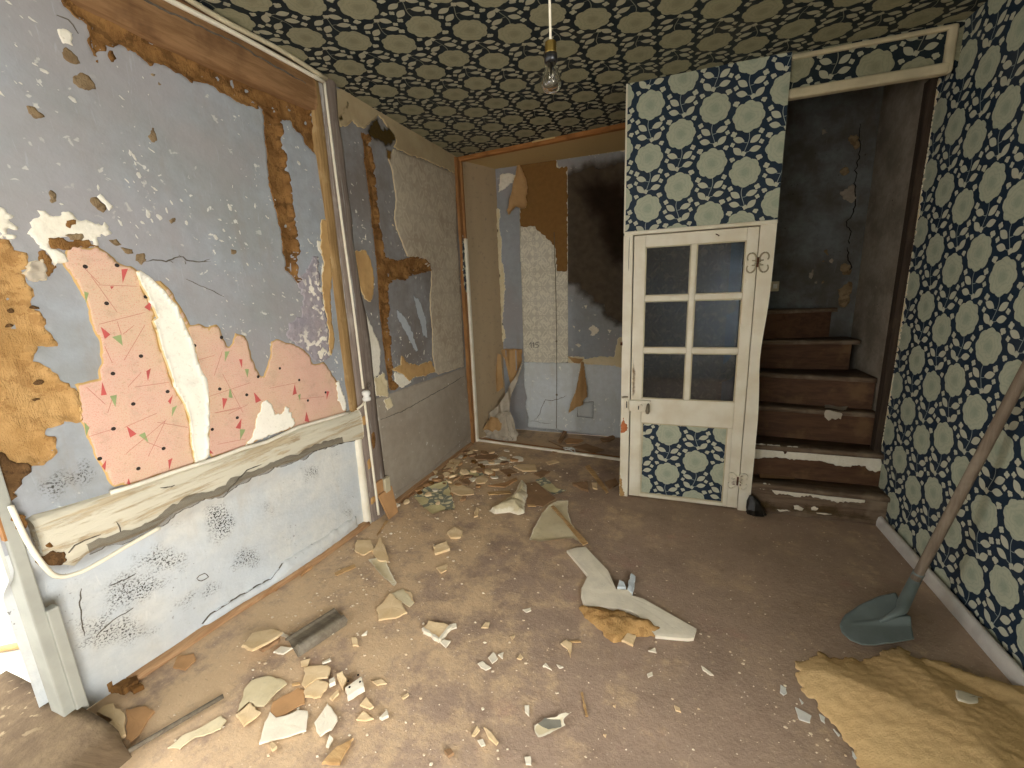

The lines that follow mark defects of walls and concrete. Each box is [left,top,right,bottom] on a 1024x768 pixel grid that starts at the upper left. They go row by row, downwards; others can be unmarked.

spalling [57,0,342,380]
crack [846,124,861,271]
crack [145,255,224,297]
spalling [361,132,432,390]
leakage [520,160,625,325]
spalling [0,128,191,501]
peeling [754,443,882,472]
peeling [763,483,865,515]
crack [79,588,133,637]
leakage [89,615,141,643]
leakage [109,575,162,604]
crack [202,563,283,624]